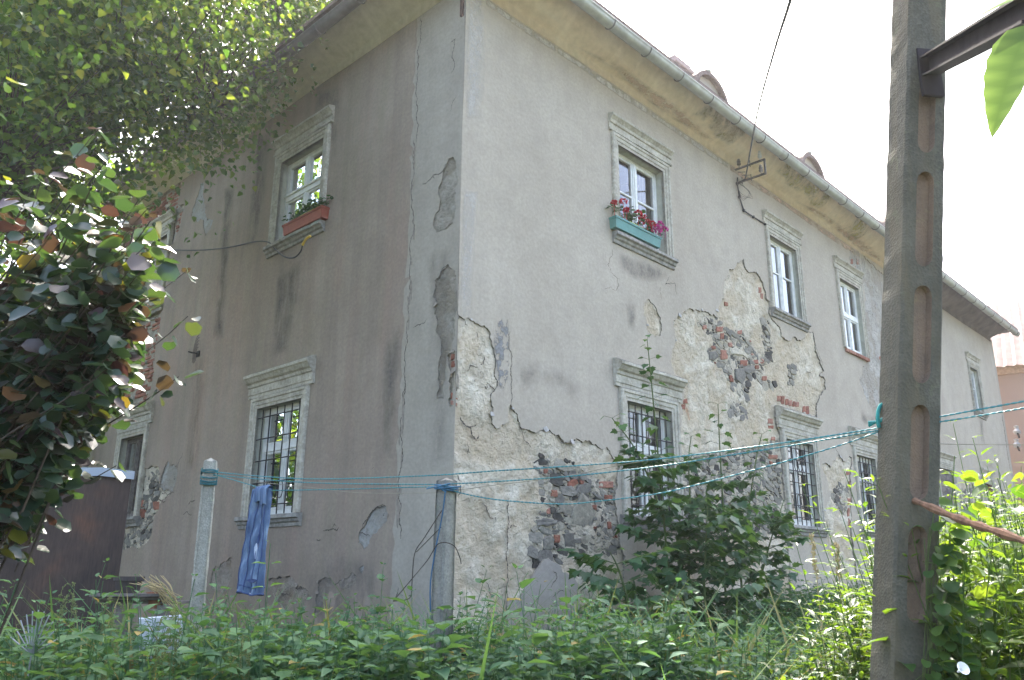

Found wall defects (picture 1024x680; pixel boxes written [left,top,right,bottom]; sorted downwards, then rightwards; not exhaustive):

flaking render [123,461,177,550]
crack [317,21,451,541]
flaking render [433,157,458,233]
flaking render [432,265,626,653]
flaking render [643,259,826,617]
flaking render [822,455,858,598]